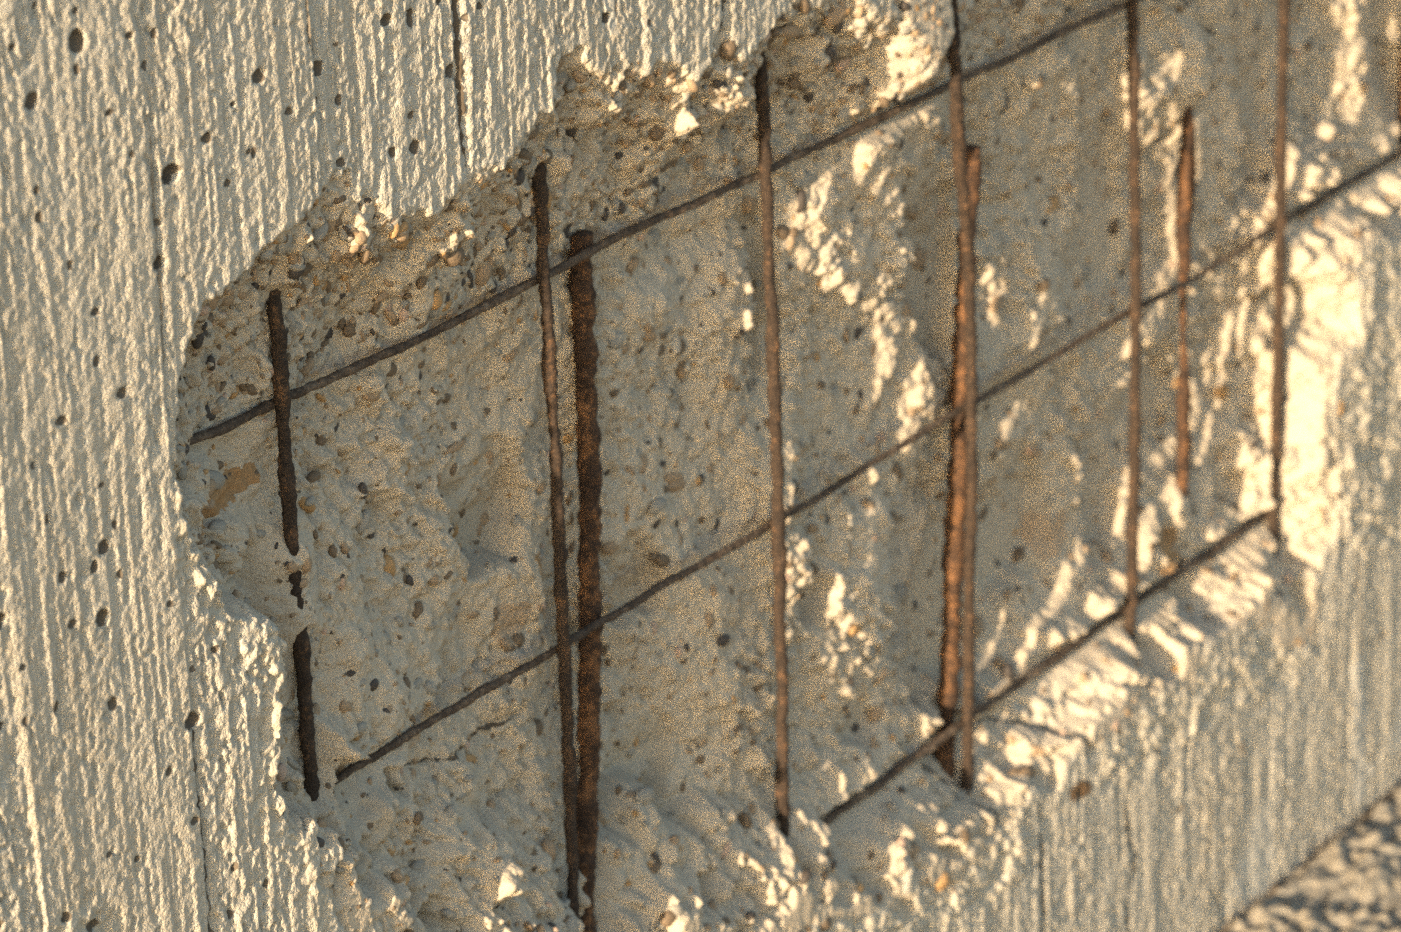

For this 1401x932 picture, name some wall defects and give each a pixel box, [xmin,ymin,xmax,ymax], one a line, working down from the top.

spalling [895,0,930,37]
spalling [921,0,949,30]
spalling [702,272,728,324]
spalling [657,311,676,360]
spalling [1058,444,1342,785]
spalling [571,642,580,780]
spalling [954,667,964,723]